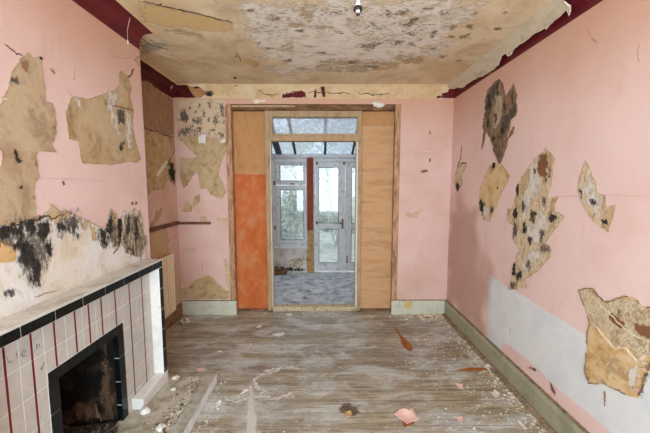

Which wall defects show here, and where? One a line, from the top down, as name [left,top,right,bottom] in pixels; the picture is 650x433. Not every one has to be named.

damp [242,1,350,40]
peeling [233,0,486,79]
damp [353,3,472,50]
crack [307,89,389,97]
peeling [0,52,162,319]
peeling [65,57,226,212]
peeling [454,145,467,192]
peeling [479,79,518,222]
damp [0,207,82,290]
damp [97,214,169,259]
spalling [174,259,230,302]
peeling [488,147,650,433]